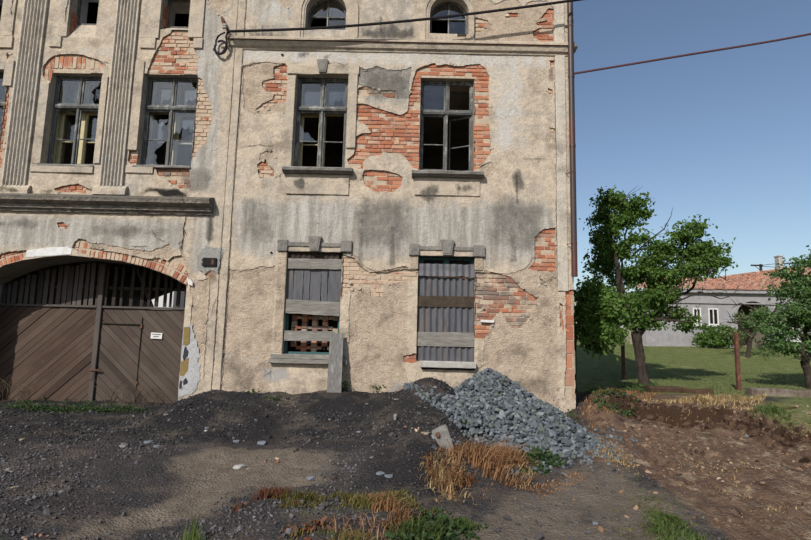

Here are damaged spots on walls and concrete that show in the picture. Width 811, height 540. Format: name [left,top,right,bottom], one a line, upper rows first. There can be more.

peeling [457,0,555,42]
flaking render [40,51,104,81]
flaking render [148,4,214,159]
peeling [241,53,297,115]
flaking render [0,87,11,168]
flaking render [347,62,494,192]
flaking render [55,184,92,194]
flaking render [157,169,191,189]
flaking render [255,148,277,178]
flaking render [0,248,27,267]
flaking render [73,239,208,360]
peeling [473,227,577,407]